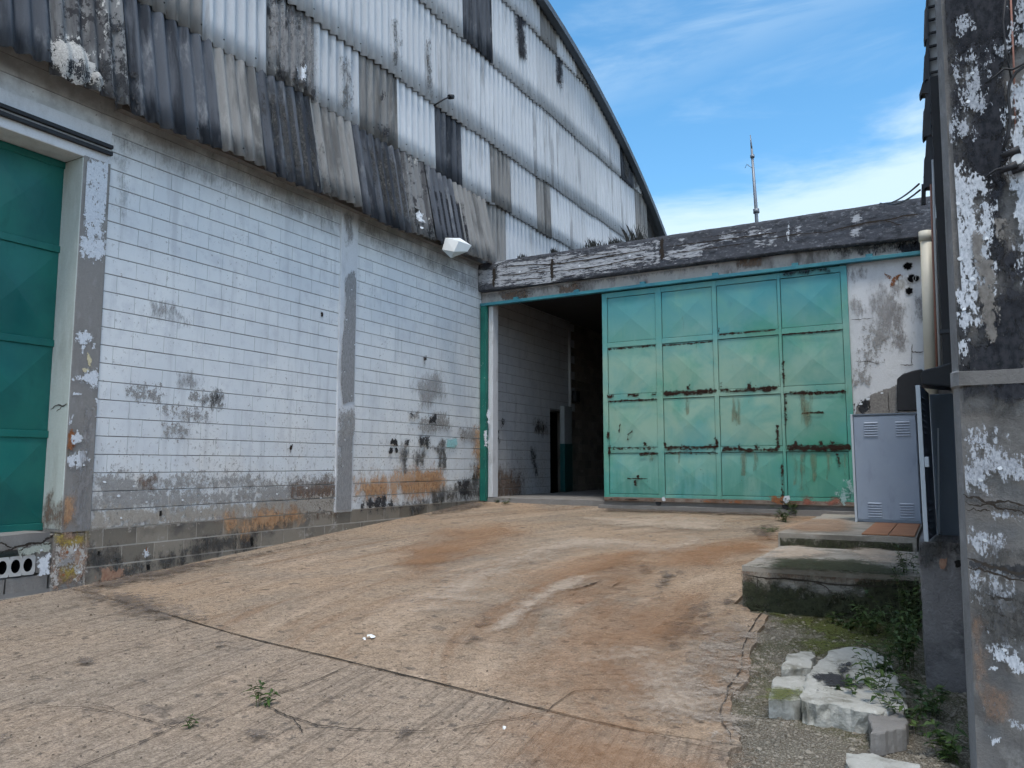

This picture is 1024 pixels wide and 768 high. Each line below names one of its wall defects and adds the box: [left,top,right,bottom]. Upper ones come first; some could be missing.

peeling [79,154,109,264]
peeling [949,0,1024,357]
leakage [856,286,905,369]
peeling [18,272,356,590]
leakage [360,426,490,515]
corrosion [607,361,851,467]
corrosion [768,464,785,504]
crack [963,494,1024,516]
leakage [59,530,258,621]
crack [968,558,1024,601]